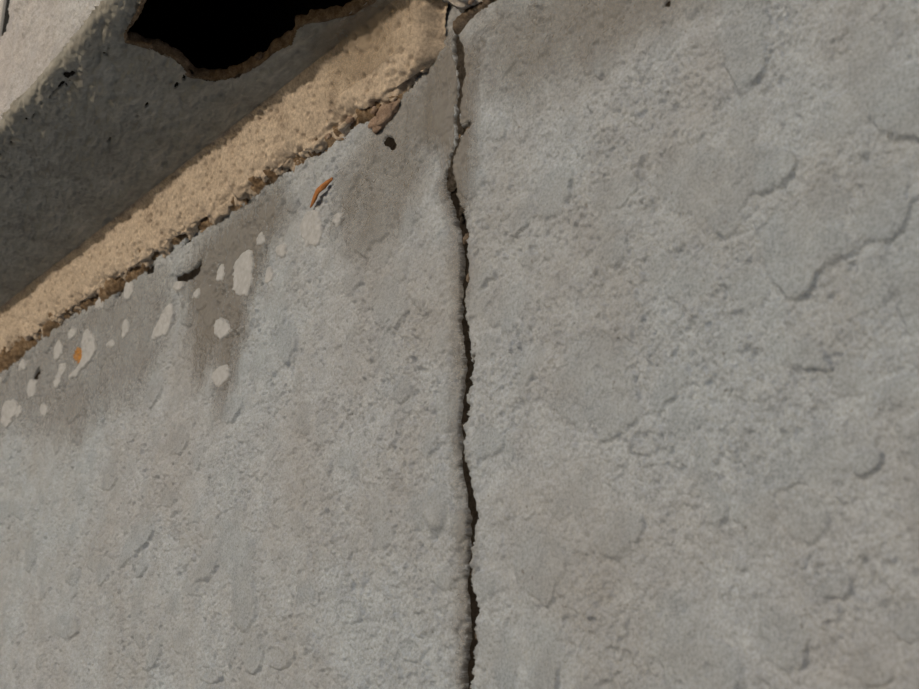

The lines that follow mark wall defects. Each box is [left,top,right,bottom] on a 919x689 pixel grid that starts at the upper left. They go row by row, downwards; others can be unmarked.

hole [124,0,377,82]
crack [447,36,480,689]